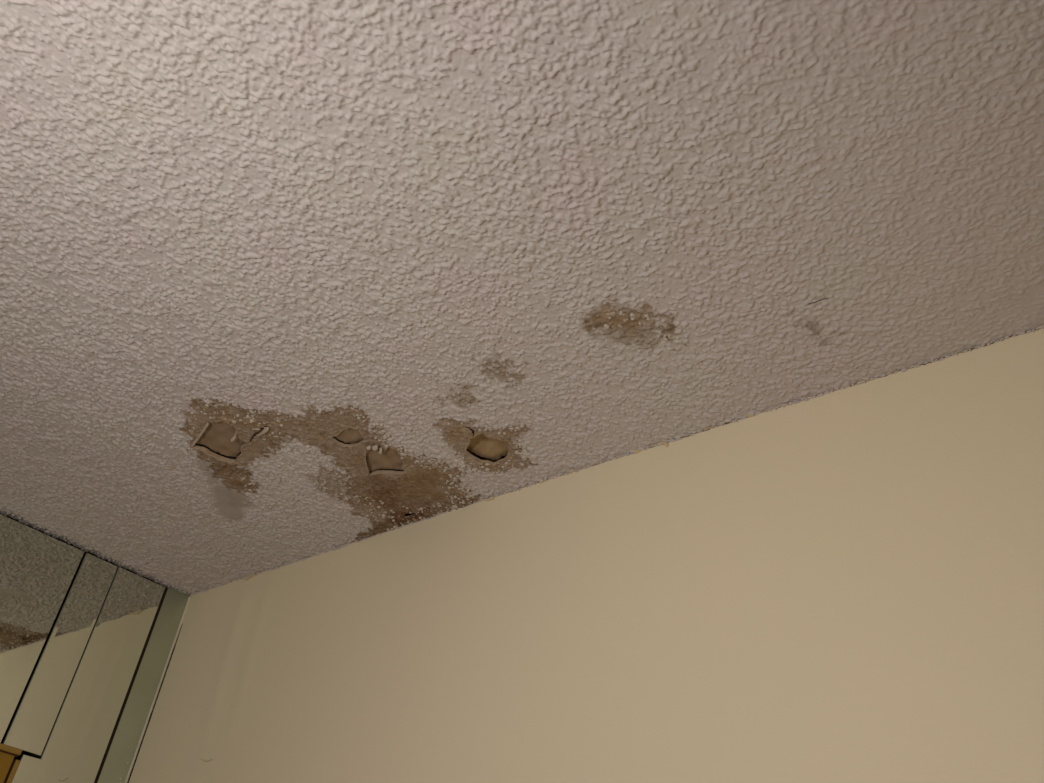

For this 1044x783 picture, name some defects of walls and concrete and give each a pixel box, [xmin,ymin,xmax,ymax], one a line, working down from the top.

leakage [585,300,680,342]
leakage [180,398,538,543]